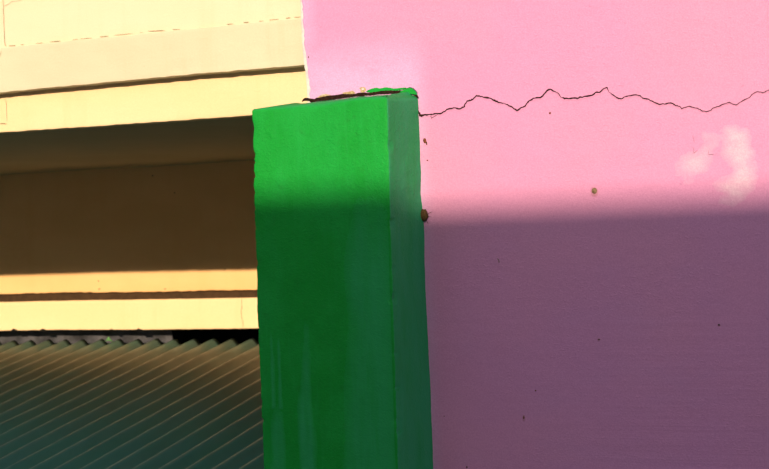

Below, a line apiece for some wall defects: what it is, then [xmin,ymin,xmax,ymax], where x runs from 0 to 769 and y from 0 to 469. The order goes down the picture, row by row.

crack [302,87,769,119]
leakage [674,124,758,208]